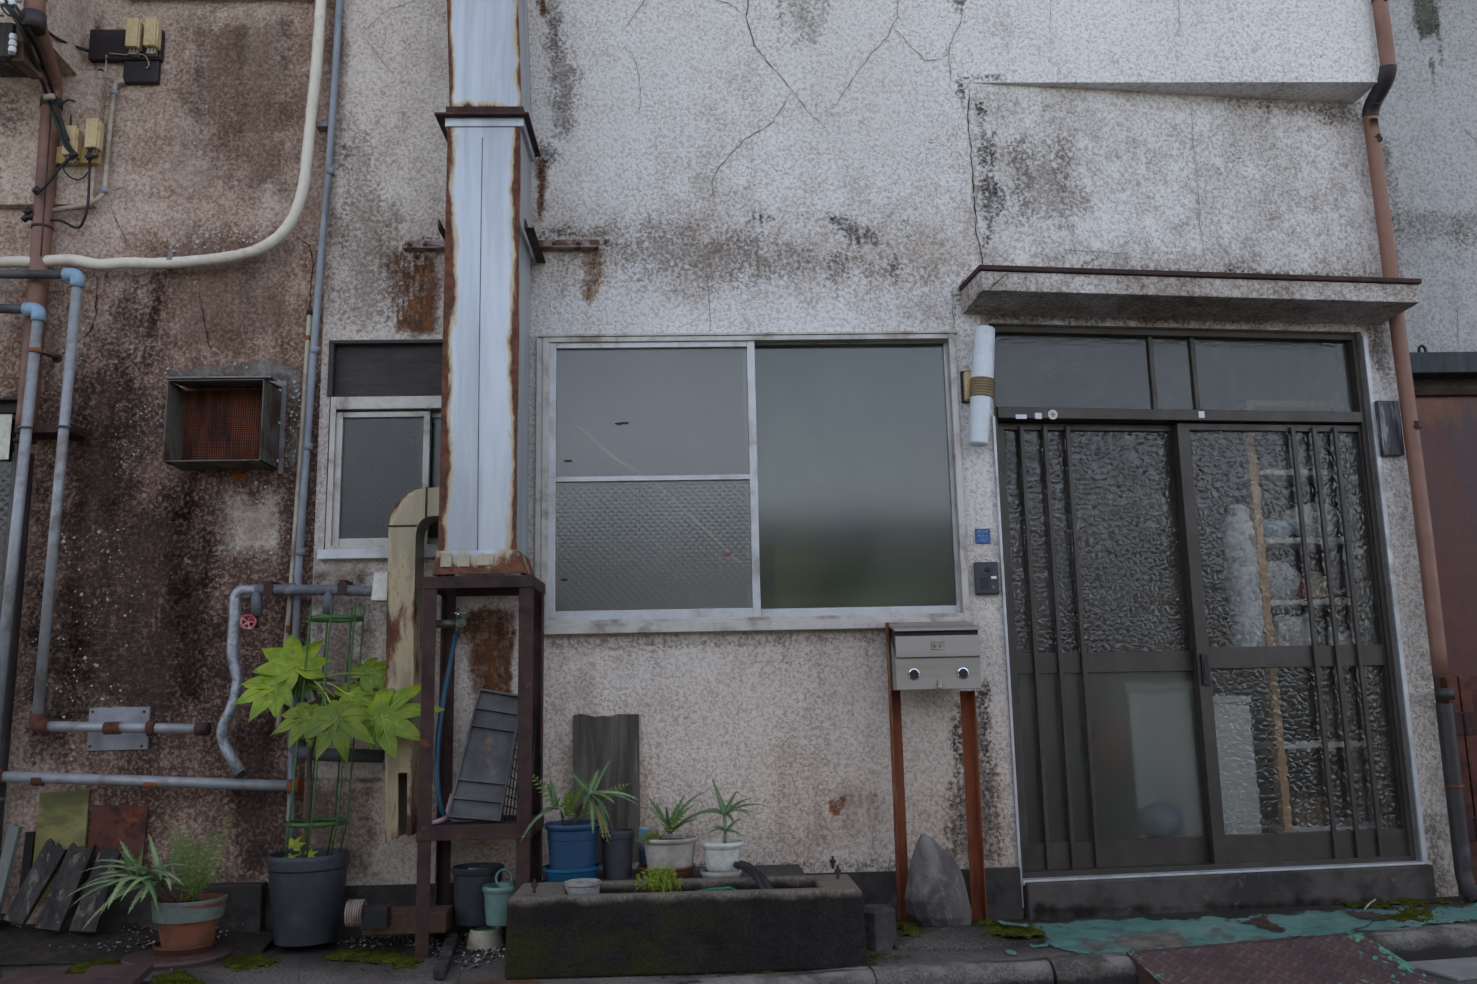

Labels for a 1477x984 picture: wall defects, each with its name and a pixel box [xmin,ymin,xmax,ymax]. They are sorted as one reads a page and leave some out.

rust [386,251,440,335]
rust [582,249,601,301]
damp [830,217,877,245]
crack [712,0,1007,328]
damp [980,134,1003,247]
damp [27,279,227,760]
rust [462,606,516,694]
damp [946,685,1001,861]